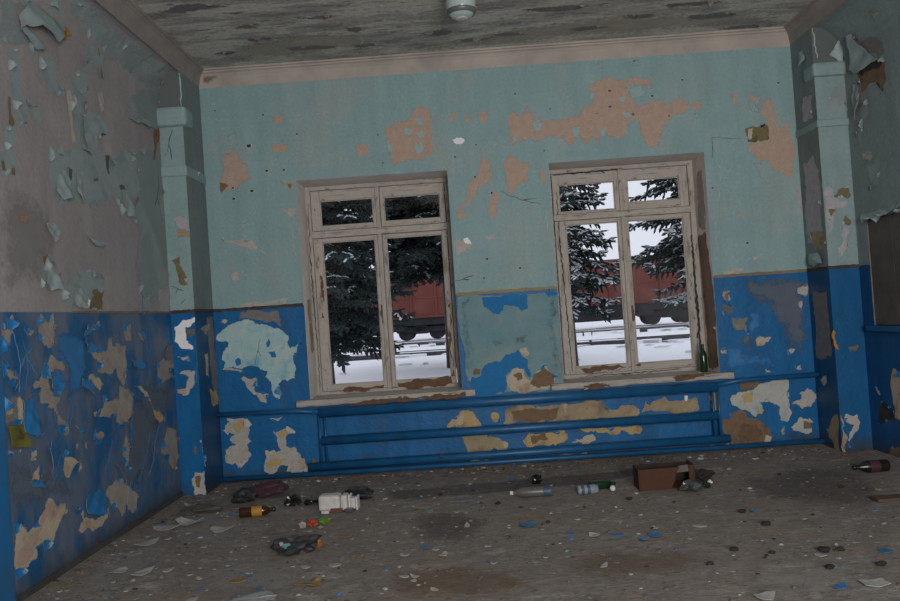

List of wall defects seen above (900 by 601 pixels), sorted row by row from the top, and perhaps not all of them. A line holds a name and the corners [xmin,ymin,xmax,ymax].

peeling [0,47,33,177]
peeling [40,88,190,314]
peeling [218,150,251,191]
peeling [384,107,435,165]
peeling [456,77,701,221]
peeling [732,91,796,177]
spalling [829,32,886,164]
peeling [673,170,832,445]
peeling [0,276,325,579]
spalling [447,410,508,461]
spalling [491,362,699,455]